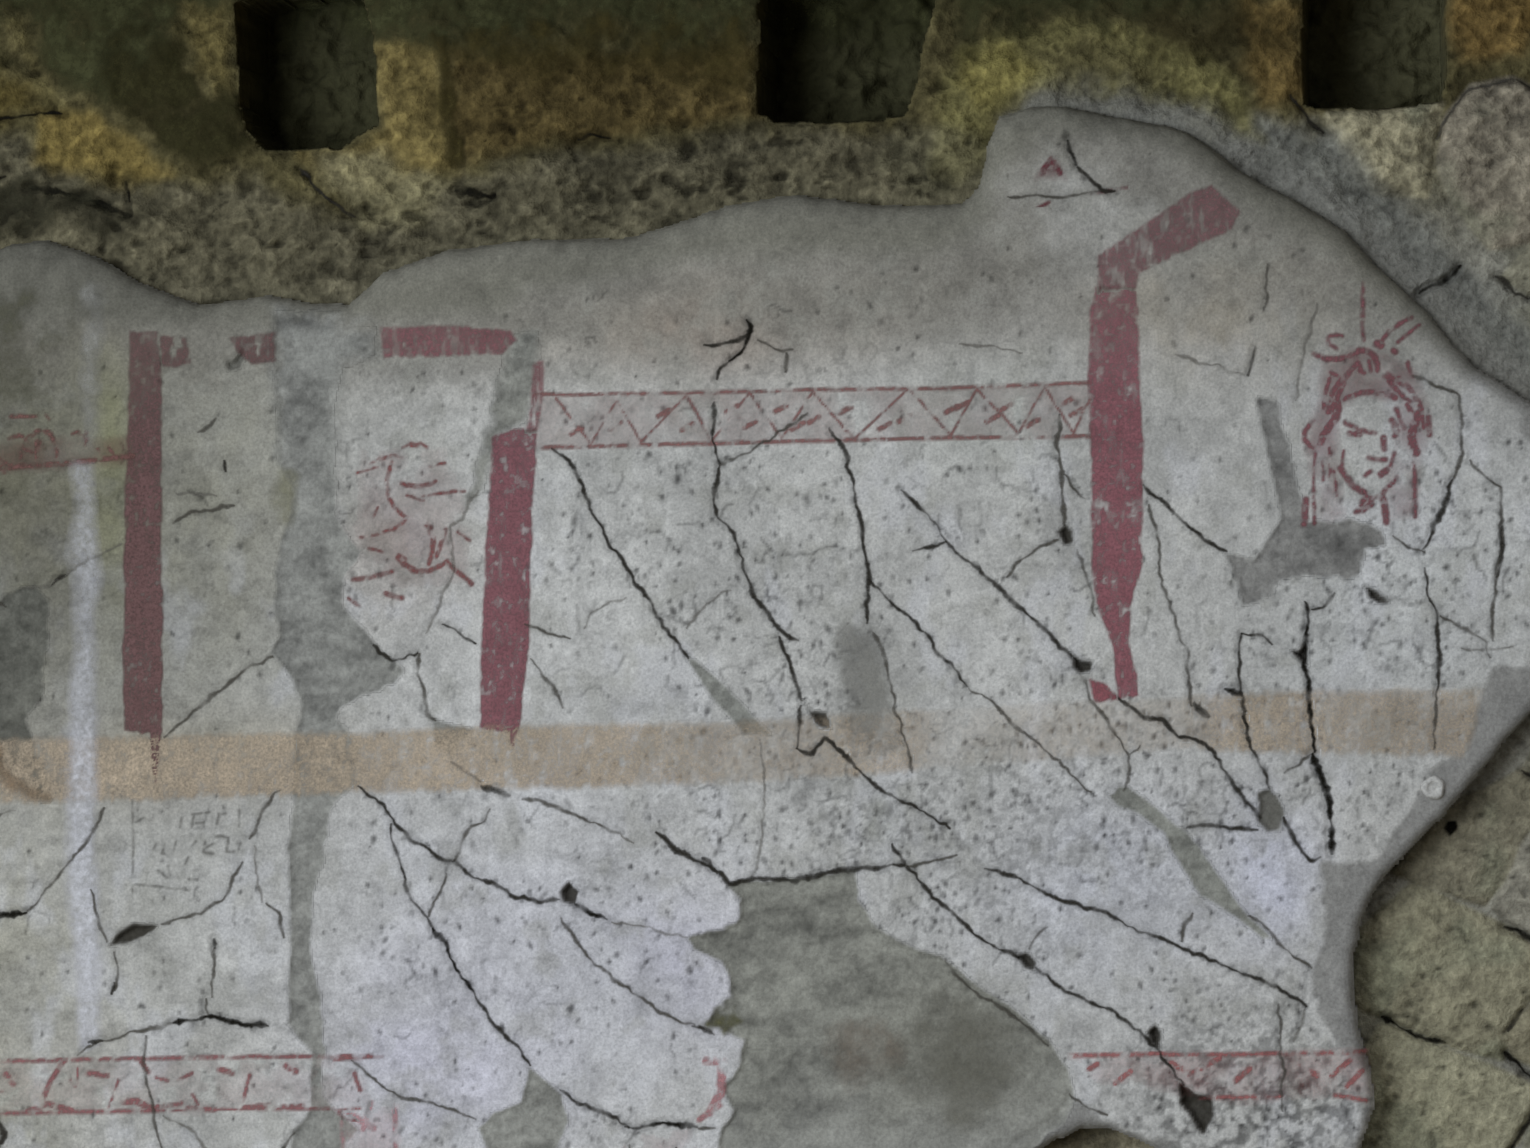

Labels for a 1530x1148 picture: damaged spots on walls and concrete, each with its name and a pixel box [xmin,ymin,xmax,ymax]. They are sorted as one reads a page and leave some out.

crack [174,418,235,522]
crack [1392,382,1505,750]
crack [164,656,273,737]
crack [358,319,1336,1112]
efflorescence [69,649,97,1045]
crack [0,807,118,995]
crack [80,791,284,1148]
flaking render [1014,952,1039,973]
crack [1381,1016,1445,1043]
crack [0,1123,8,1145]
crack [351,1060,476,1120]
crack [563,1091,713,1148]